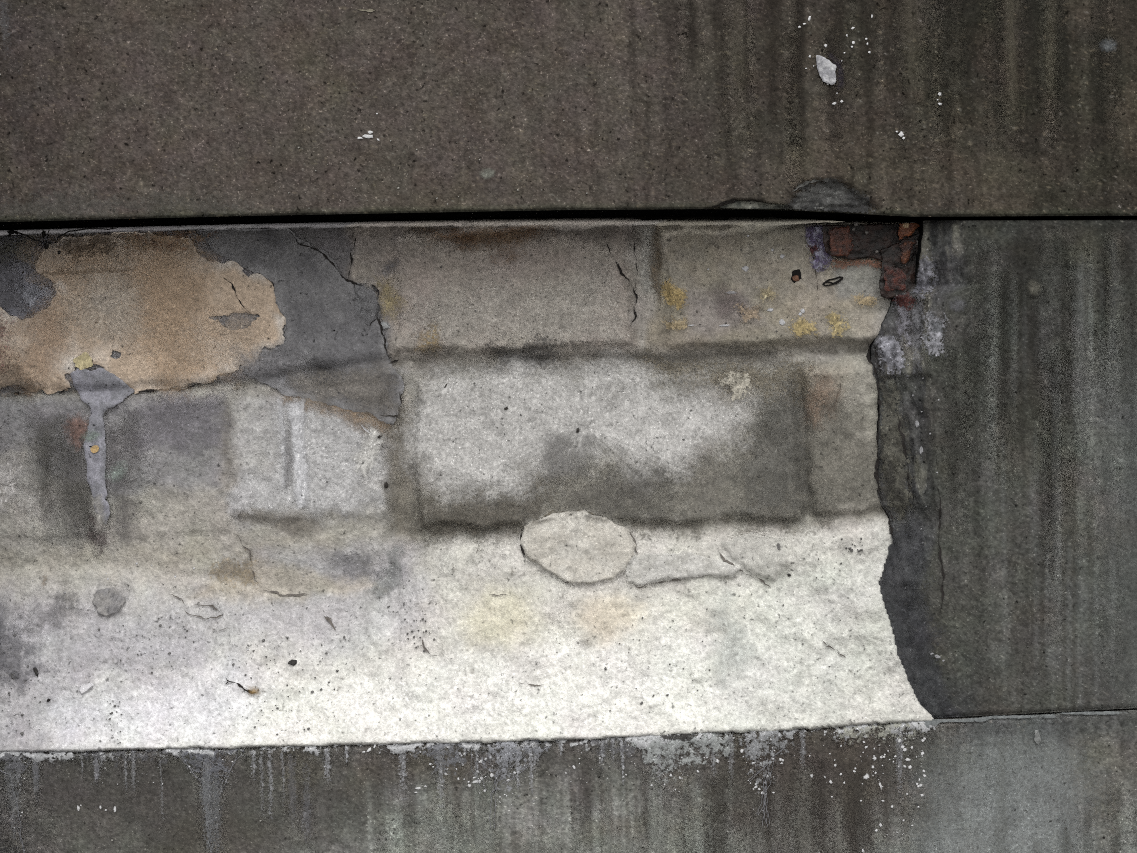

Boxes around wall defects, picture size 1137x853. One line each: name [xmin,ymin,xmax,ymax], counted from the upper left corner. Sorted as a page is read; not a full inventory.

spalling [707,178,881,214]
peeling [0,231,286,394]
crack [290,232,399,364]
crack [603,227,638,334]
peeling [884,223,920,291]
efflorescence [876,250,964,376]
spalling [520,507,791,588]
spalling [879,374,951,716]
spalling [232,624,349,735]
leakage [0,751,113,829]
leakage [129,721,935,847]
leakage [925,747,1072,853]